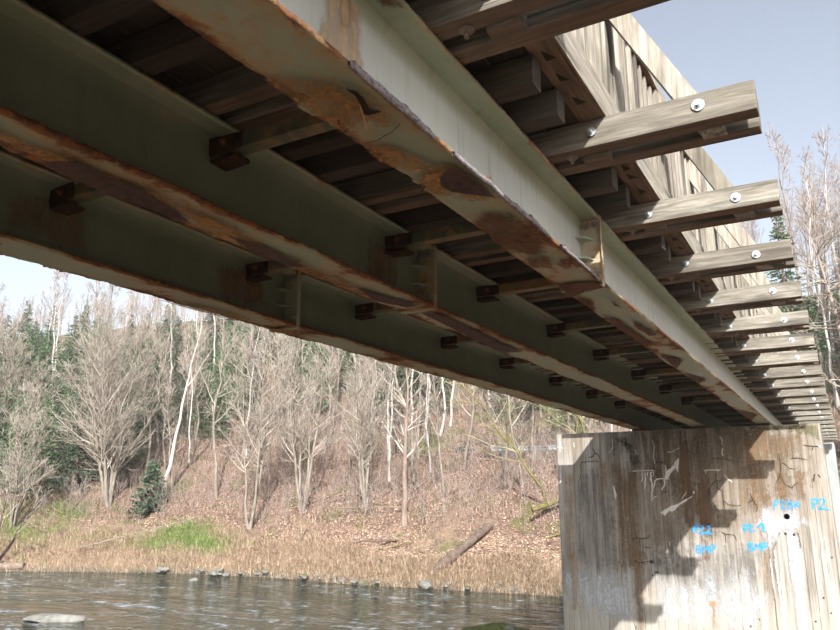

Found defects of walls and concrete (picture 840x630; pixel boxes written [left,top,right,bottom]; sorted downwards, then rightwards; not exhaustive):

rust [265,0,437,141]
rust [370,146,602,310]
rust [360,354,416,368]
rust [603,317,656,346]
crack [688,452,758,511]
crack [774,445,821,488]
water stain [659,508,811,630]